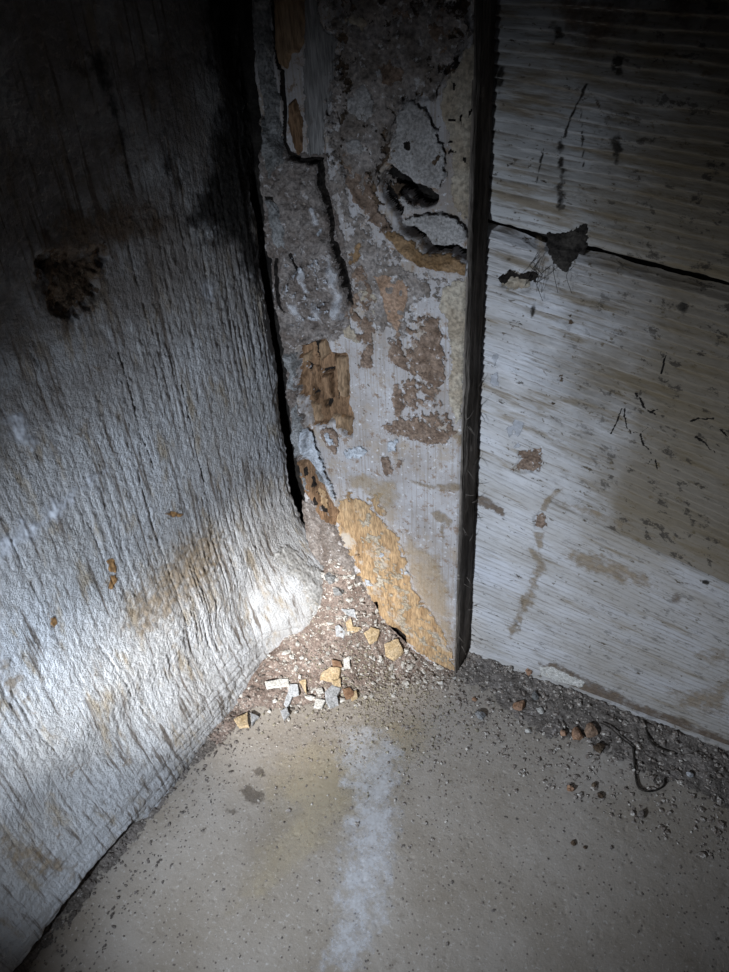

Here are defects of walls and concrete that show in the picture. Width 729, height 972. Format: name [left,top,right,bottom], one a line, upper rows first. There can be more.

peeling [314,0,475,246]
crack [235,0,354,524]
peeling [498,269,538,291]
peeling [282,340,336,391]
peeling [339,243,466,477]
peeling [290,405,367,512]
peeling [506,419,542,471]
peeling [239,563,457,721]